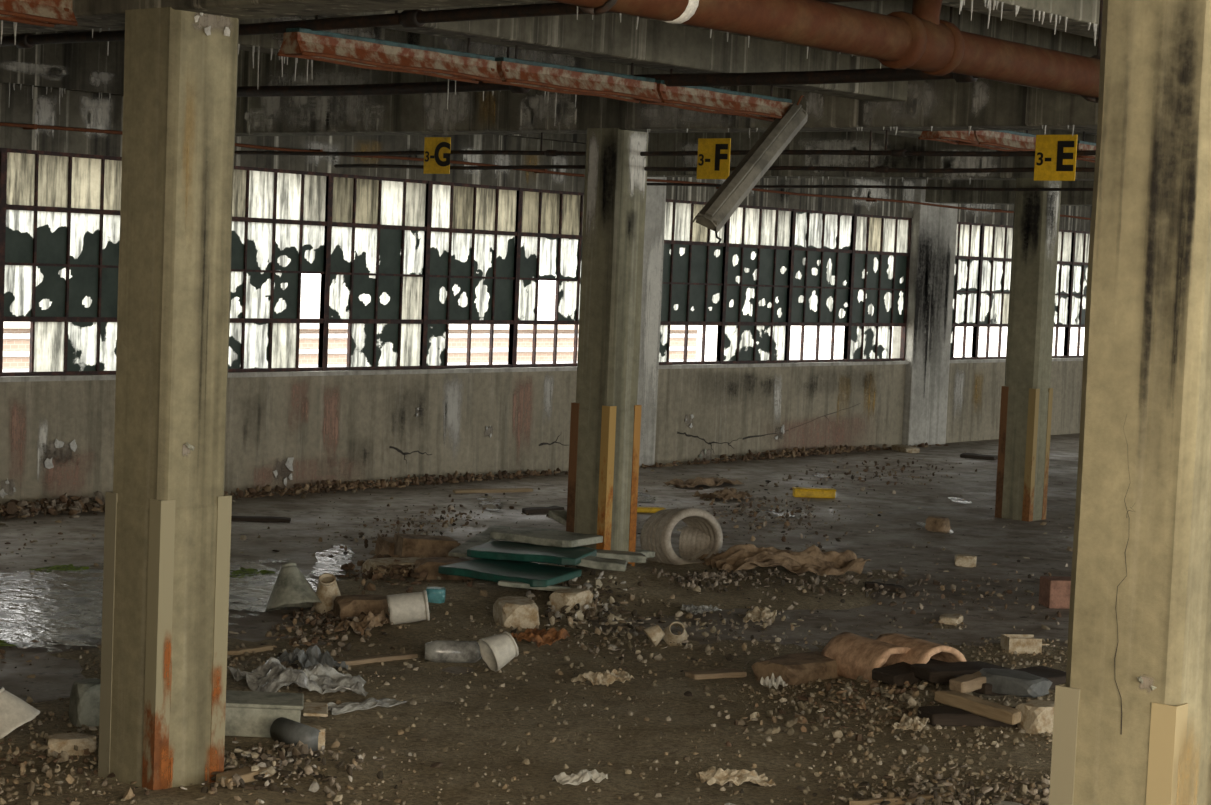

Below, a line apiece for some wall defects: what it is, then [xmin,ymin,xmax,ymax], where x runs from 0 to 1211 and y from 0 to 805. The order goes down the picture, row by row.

damp [914,230,950,391]
crack [677,403,860,452]
peeling [44,439,77,469]
rust [164,640,172,701]
rust [160,747,173,787]